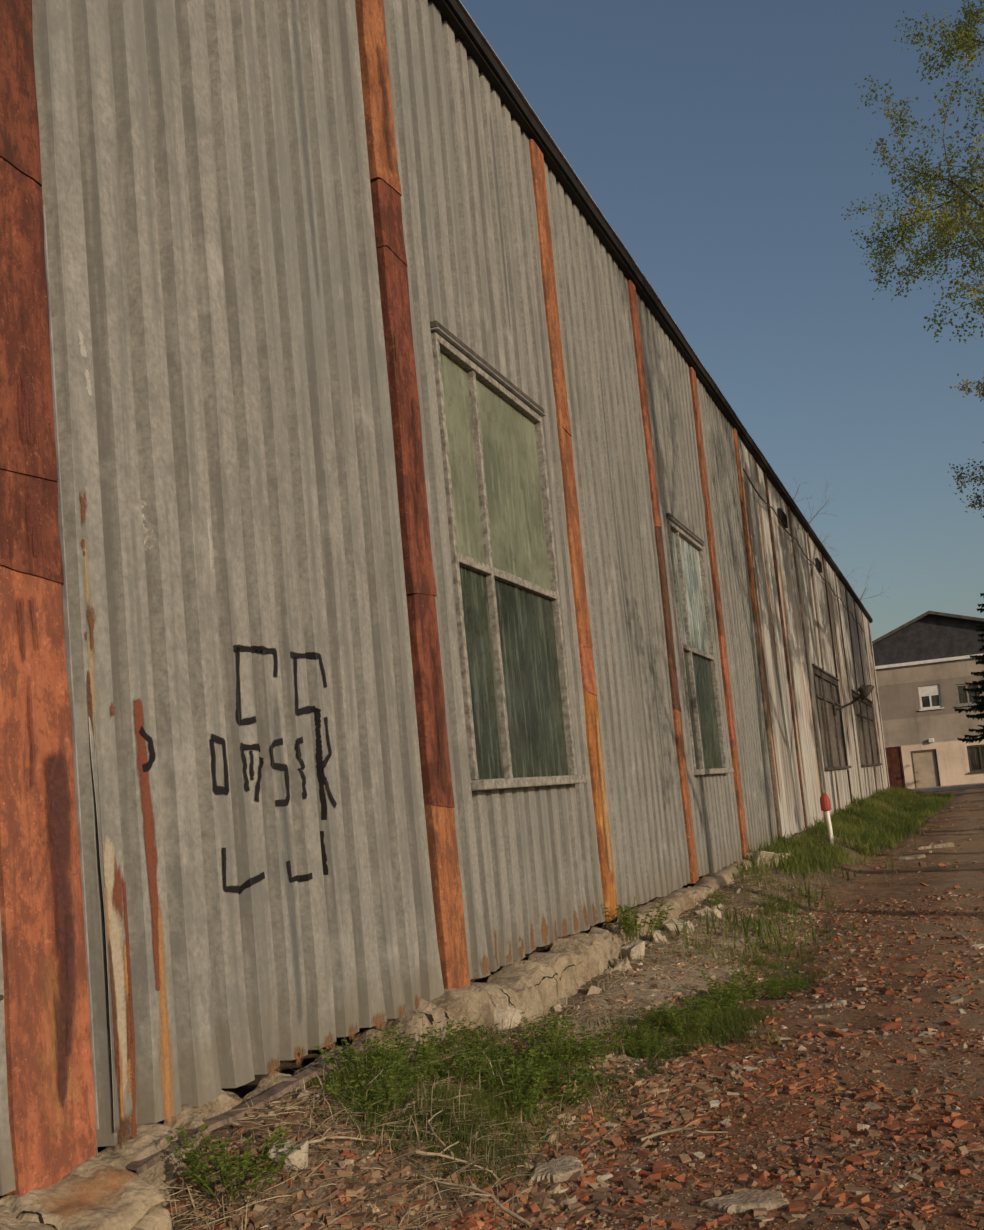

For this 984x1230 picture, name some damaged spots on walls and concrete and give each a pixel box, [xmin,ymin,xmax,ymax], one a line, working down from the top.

corrosion [378,49,394,168]
corrosion [81,539,95,750]
corrosion [134,699,174,1122]